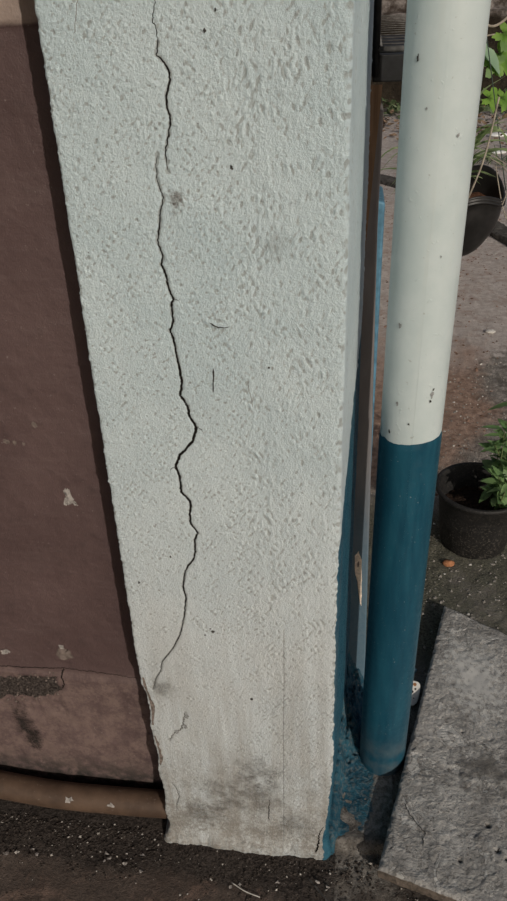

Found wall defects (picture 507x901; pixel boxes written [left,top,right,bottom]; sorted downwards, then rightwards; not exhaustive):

crack [1,0,203,688]
peeling [63,488,78,506]
spalling [0,671,62,702]